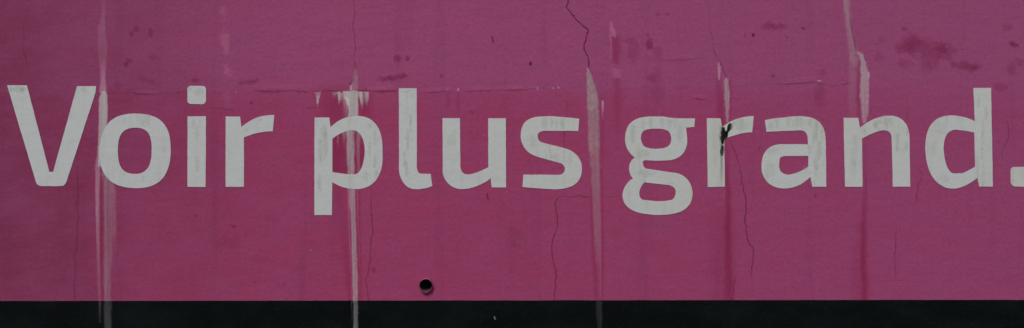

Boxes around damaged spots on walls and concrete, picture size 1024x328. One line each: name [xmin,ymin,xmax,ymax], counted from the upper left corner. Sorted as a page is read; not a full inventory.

crack [566,0,590,66]
efflorescence [338,91,362,117]